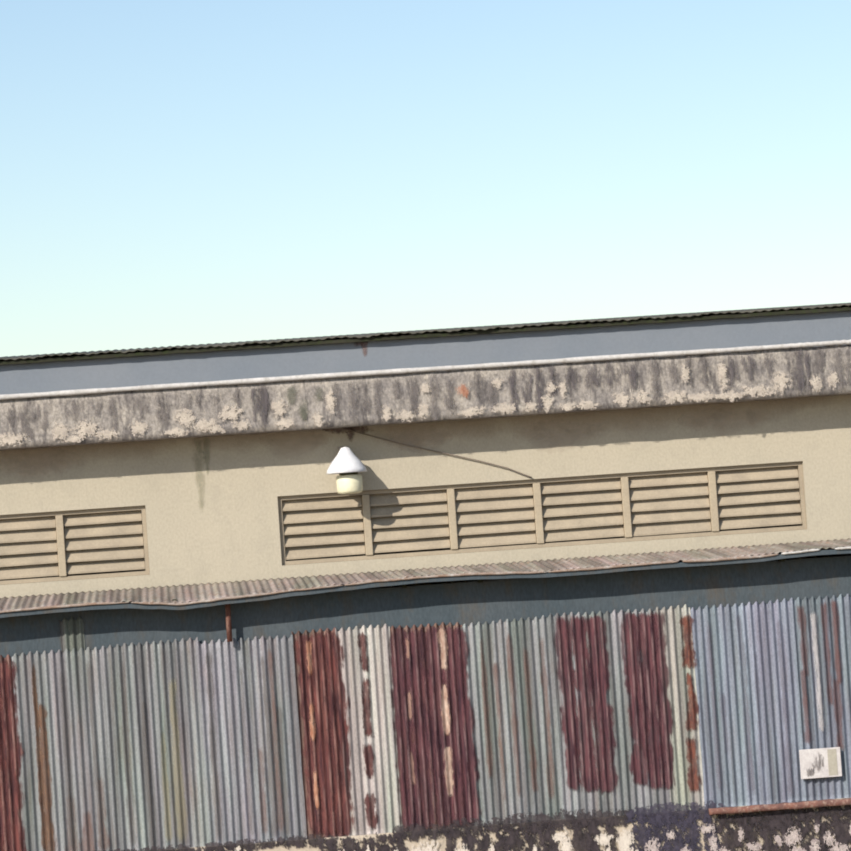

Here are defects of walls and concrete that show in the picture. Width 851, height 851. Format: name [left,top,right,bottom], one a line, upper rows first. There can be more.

damp [251,385,269,429]
damp [322,380,382,439]
damp [506,361,640,413]
damp [722,350,775,388]
rust [0,661,26,851]
damp [210,725,220,815]
rust [295,632,355,837]
rust [358,632,375,779]
rust [389,626,503,829]
damp [96,768,851,851]
rust [554,616,618,794]
rust [620,611,675,789]